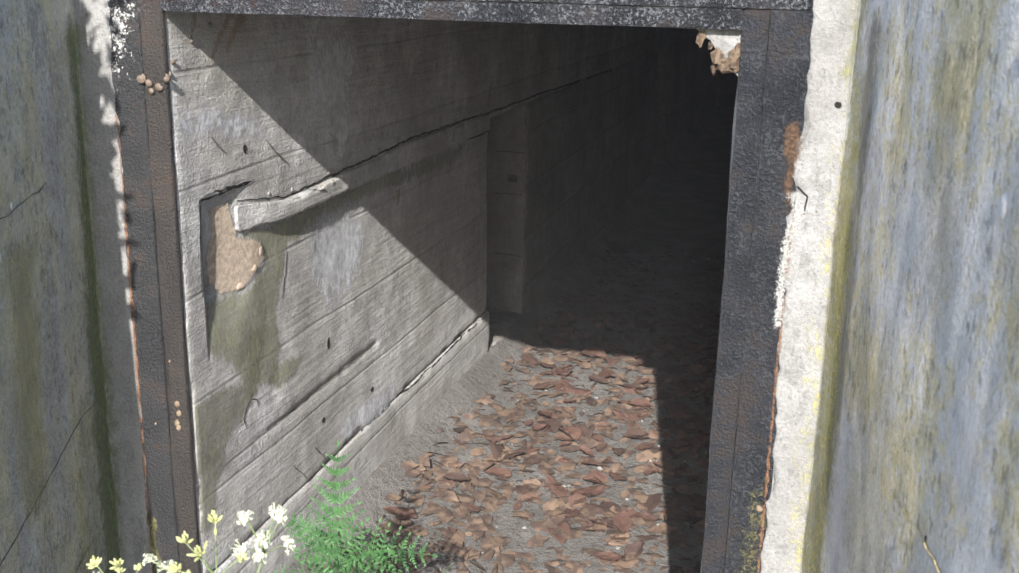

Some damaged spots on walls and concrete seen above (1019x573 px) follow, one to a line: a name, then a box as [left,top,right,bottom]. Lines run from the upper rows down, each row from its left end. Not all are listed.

spalling [695,29,742,78]
spalling [206,202,264,295]
crack [200,68,617,297]
peeling [772,192,805,328]
rust [784,122,803,280]
rust [757,293,787,573]
crack [894,496,940,573]